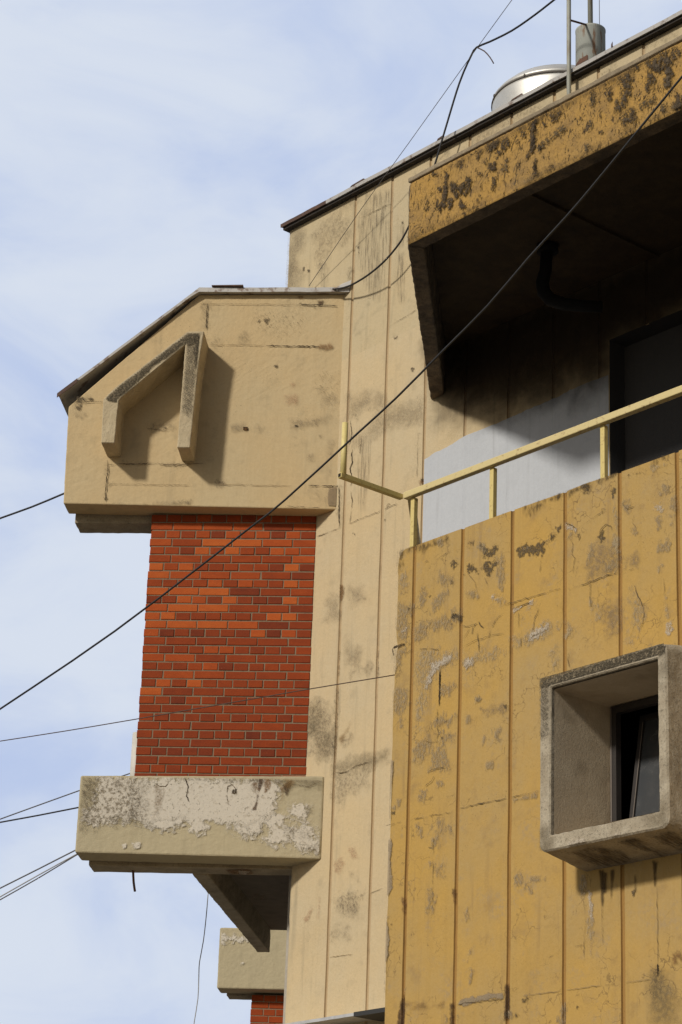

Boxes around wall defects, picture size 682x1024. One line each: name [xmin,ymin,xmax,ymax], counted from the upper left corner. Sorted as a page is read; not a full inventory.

spalling [516,487,633,576]
peeling [393,541,505,728]
peeling [80,776,320,854]
peeling [458,970,503,1006]